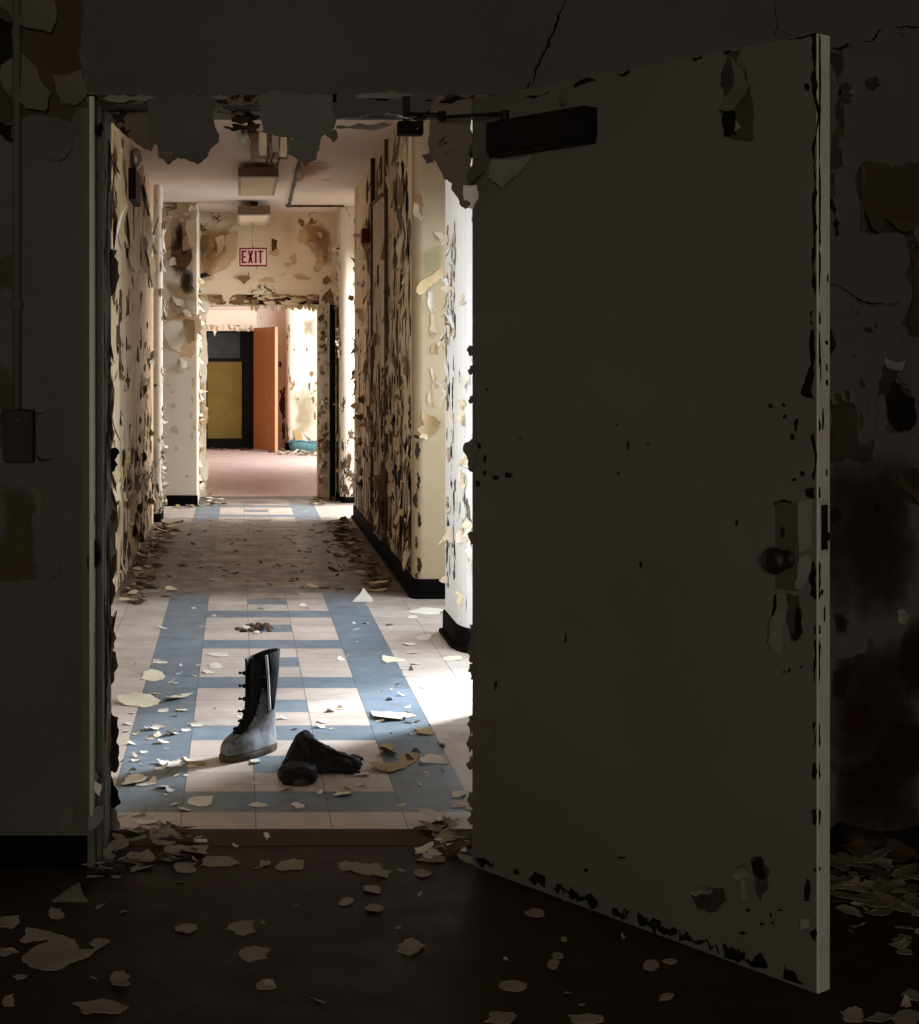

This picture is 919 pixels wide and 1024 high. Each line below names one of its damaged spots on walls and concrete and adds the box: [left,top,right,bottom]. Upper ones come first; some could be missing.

peeling [0,0,89,142]
spalling [217,110,261,143]
crack [521,0,566,90]
peeling [722,84,755,142]
leakage [310,227,329,262]
peeling [855,161,919,341]
peeling [52,121,513,835]
spalling [768,310,919,682]
peeling [513,868,769,969]
peeling [746,856,770,912]
peeling [499,980,527,992]
peeling [643,958,678,971]